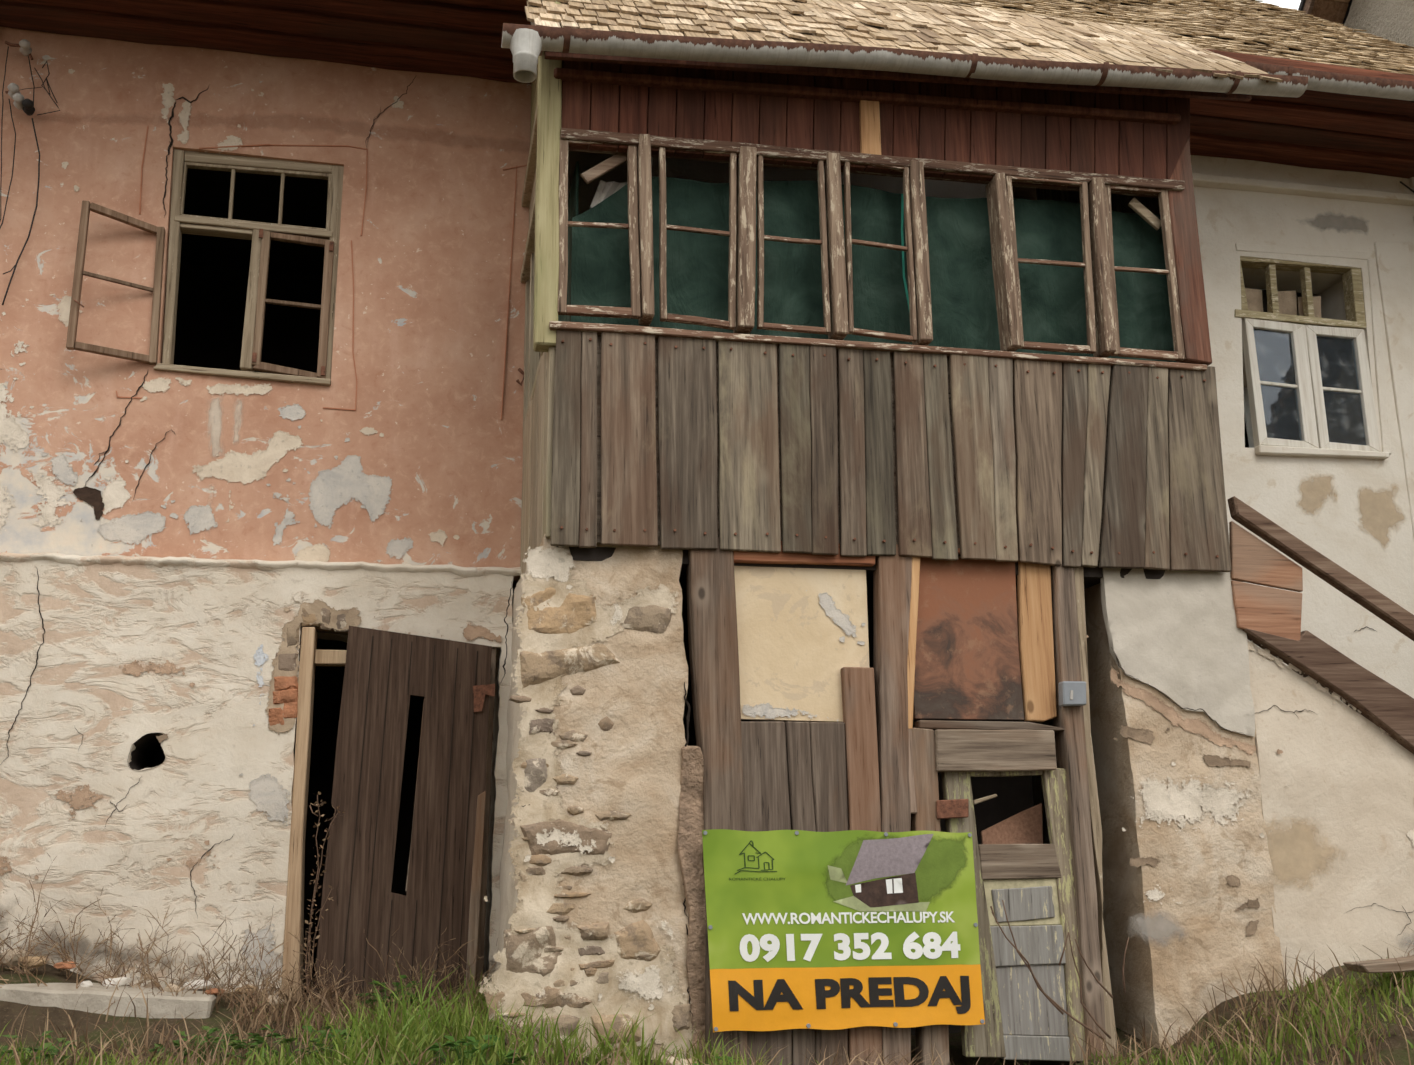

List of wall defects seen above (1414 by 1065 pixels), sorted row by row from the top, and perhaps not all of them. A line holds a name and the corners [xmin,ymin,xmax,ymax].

crack [163,86,209,217]
peeling [50,294,82,327]
crack [85,372,148,486]
crack [133,431,175,499]
peeling [0,341,393,562]
leakage [1300,476,1335,513]
leakage [1360,489,1404,544]
crack [0,567,45,765]
spalling [253,597,383,735]
peeling [1110,668,1261,834]
peeling [1143,884,1183,905]
spalling [1227,875,1260,937]